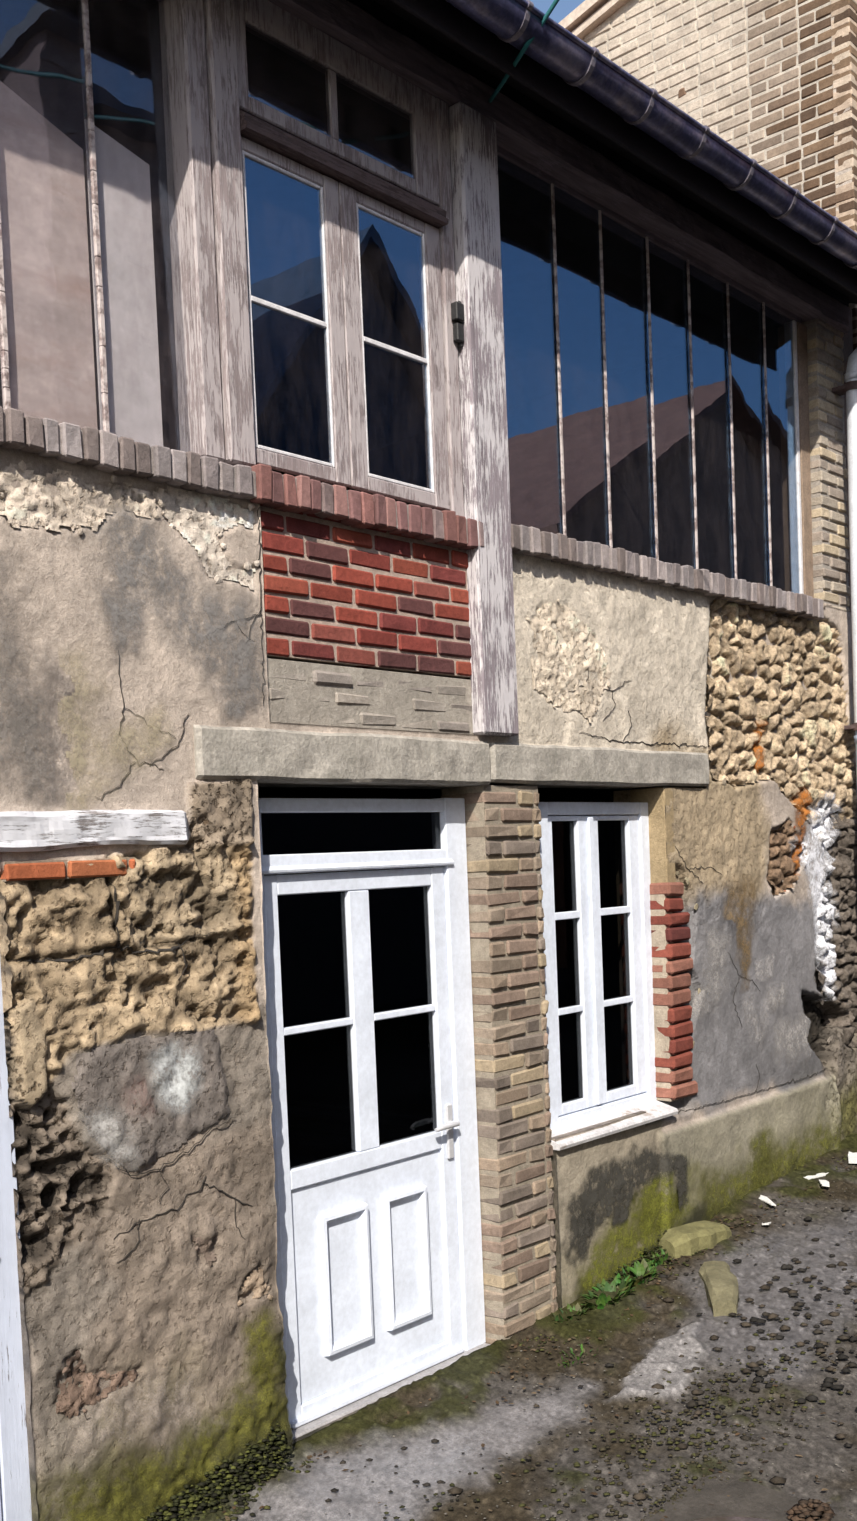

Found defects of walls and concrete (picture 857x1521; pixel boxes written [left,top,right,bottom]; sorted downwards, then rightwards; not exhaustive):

flaking render [0,460,260,590]
flaking render [705,600,857,1063]
damp [794,797,838,1000]
crack [105,1117,252,1263]
damp [566,1148,688,1259]
damp [80,1382,192,1441]